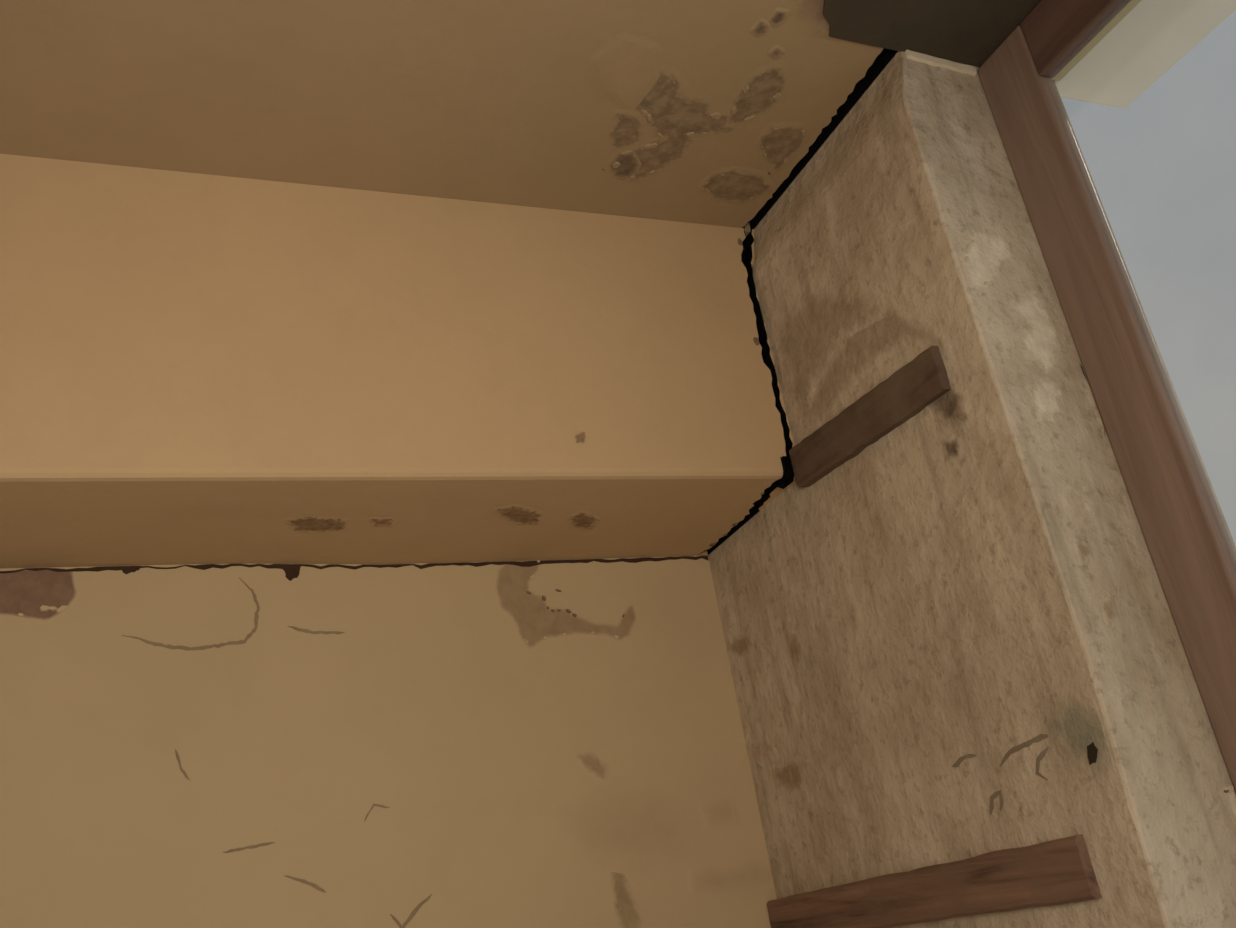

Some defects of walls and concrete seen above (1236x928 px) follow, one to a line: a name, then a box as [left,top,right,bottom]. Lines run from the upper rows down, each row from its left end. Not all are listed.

peeling [599,59,796,186]
crack [0,48,898,651]
flaking render [0,567,81,626]
flaking render [491,560,641,652]